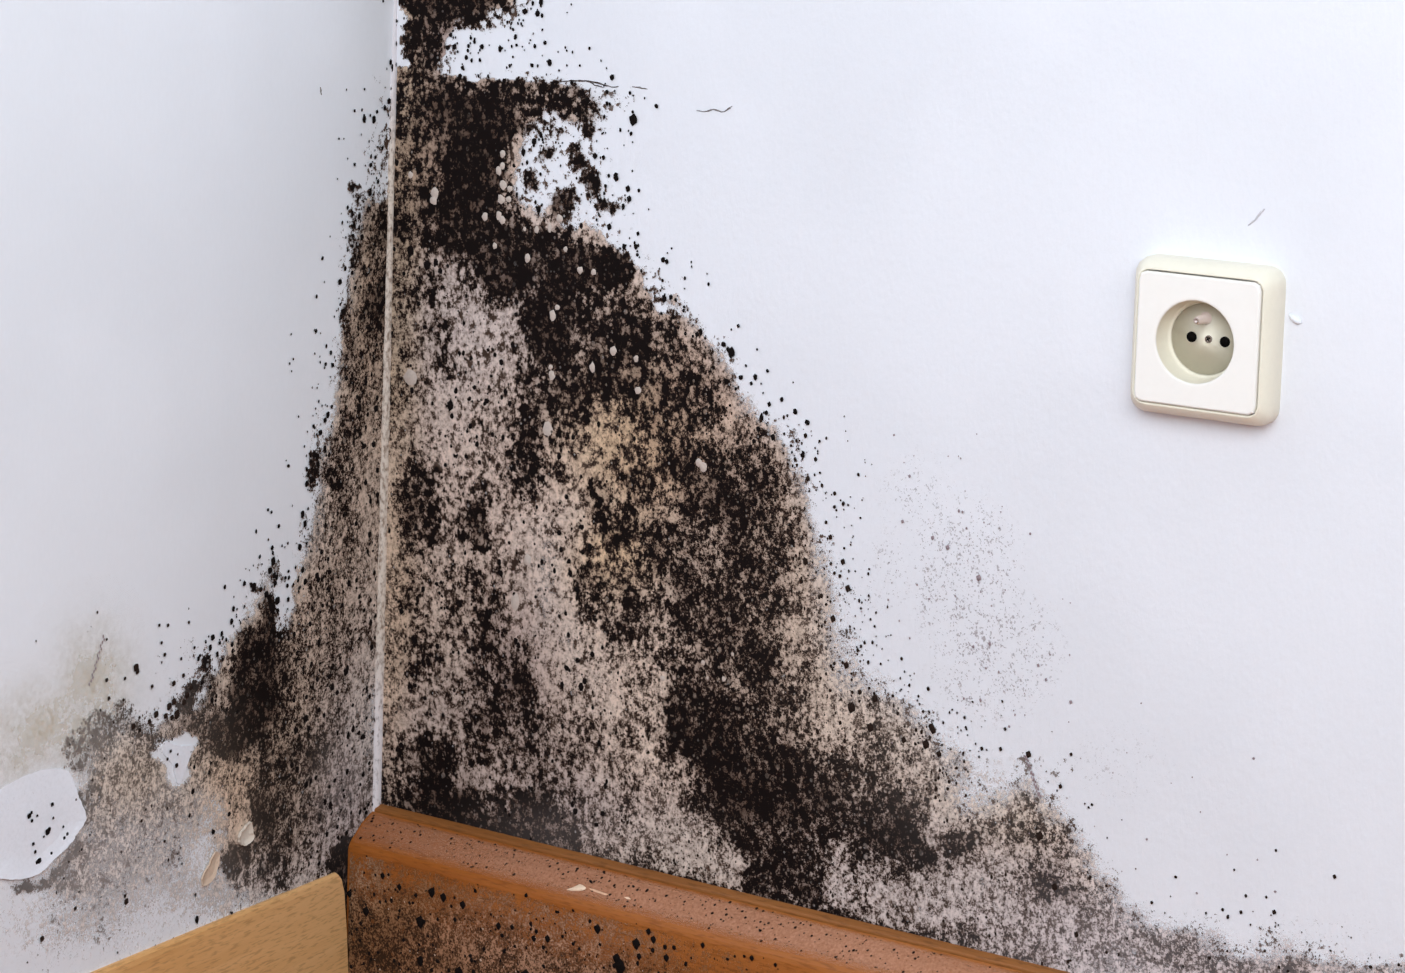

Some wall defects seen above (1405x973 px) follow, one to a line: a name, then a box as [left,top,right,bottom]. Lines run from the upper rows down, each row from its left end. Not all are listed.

leakage [354,97,391,129]
leakage [76,634,108,700]
peeling [161,741,193,784]
peeling [0,768,87,880]
leakage [433,834,1000,973]